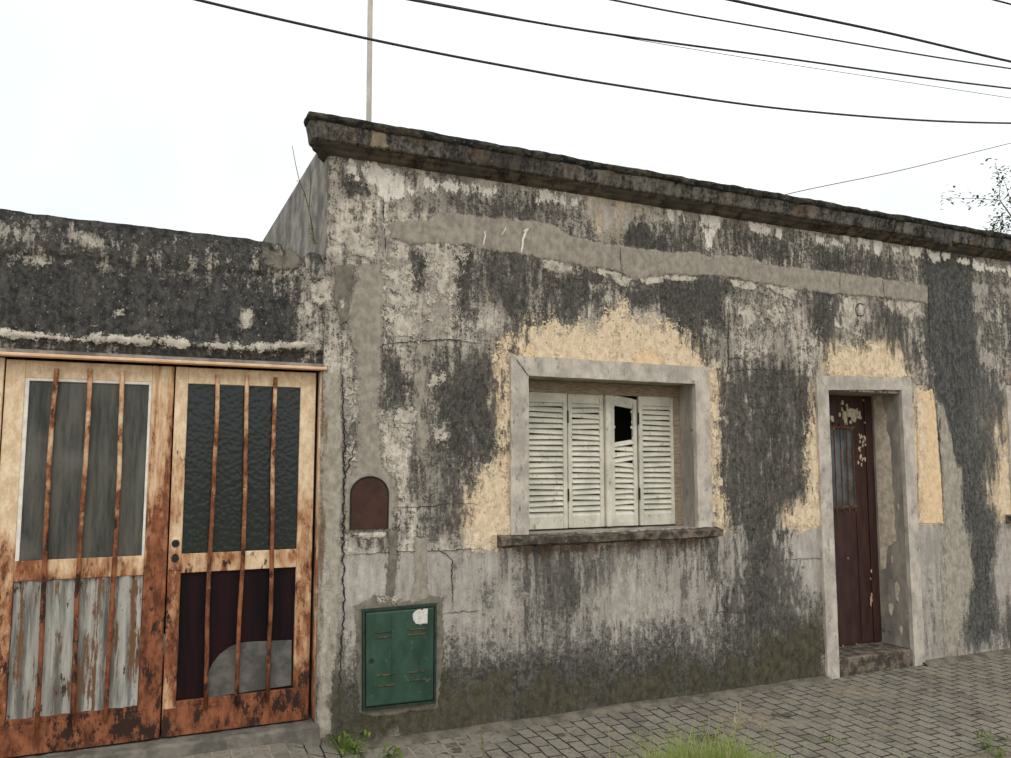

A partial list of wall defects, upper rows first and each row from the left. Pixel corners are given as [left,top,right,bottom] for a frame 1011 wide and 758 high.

damp [597,201,721,254]
damp [343,385,356,408]
damp [344,441,358,467]
crack [336,370,482,734]
damp [348,221,1011,741]
peeling [830,395,899,580]